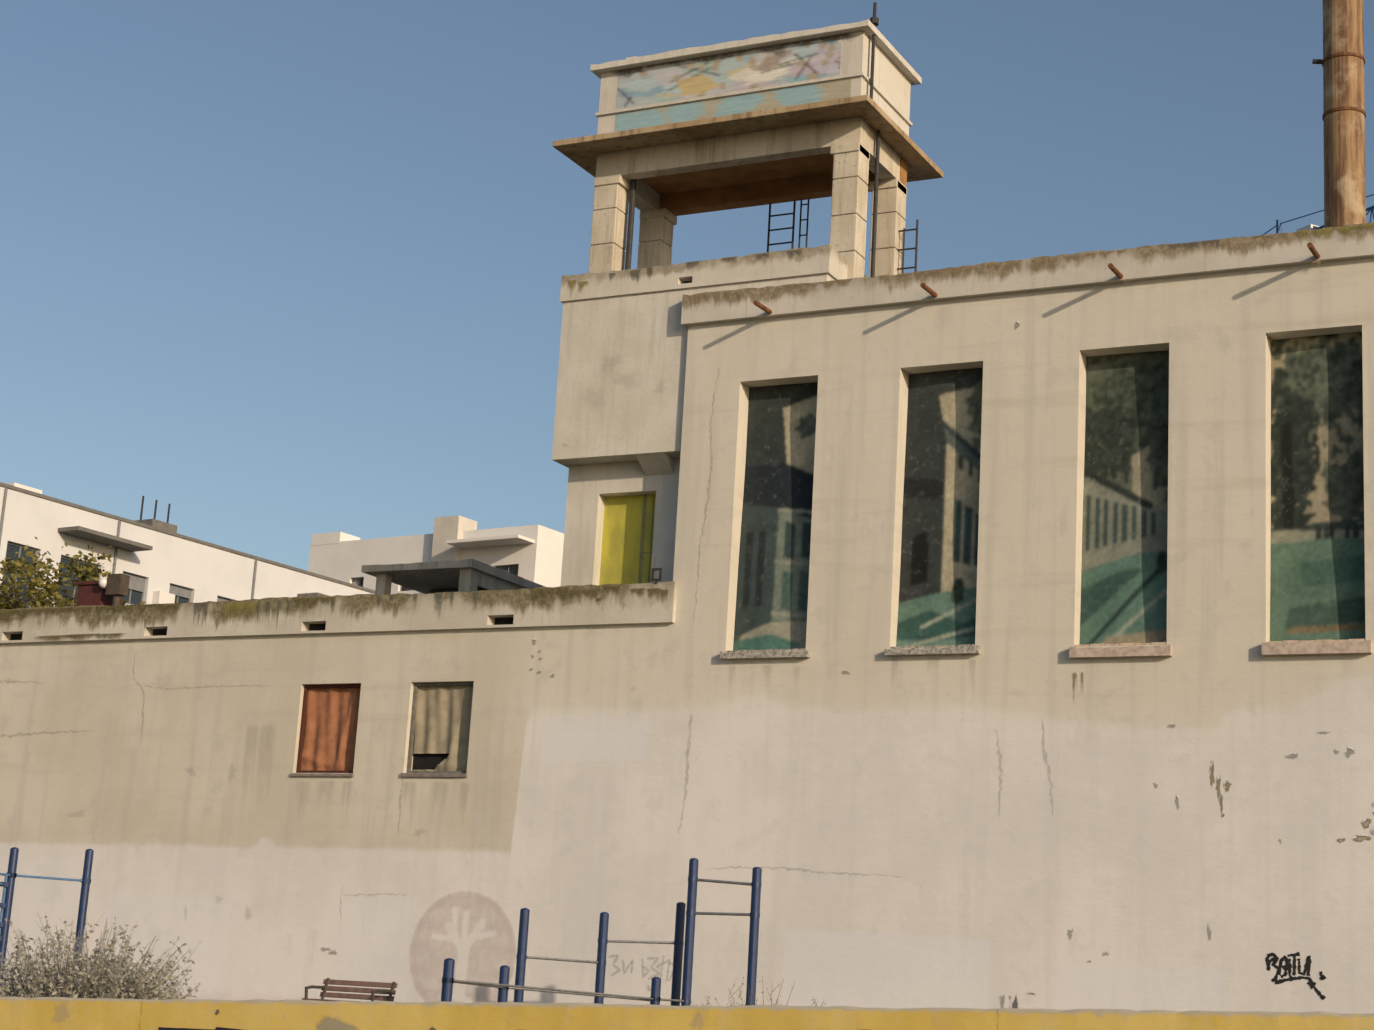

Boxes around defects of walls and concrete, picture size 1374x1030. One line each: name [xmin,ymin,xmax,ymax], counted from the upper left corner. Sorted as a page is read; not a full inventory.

leakage [1315,224,1374,237]
leakage [1169,239,1220,248]
leakage [542,587,601,602]
leakage [631,588,668,597]
leakage [21,602,209,616]
leakage [233,600,291,620]
leakage [308,597,335,608]
peeling [1209,763,1231,817]
peeling [1337,812,1374,843]